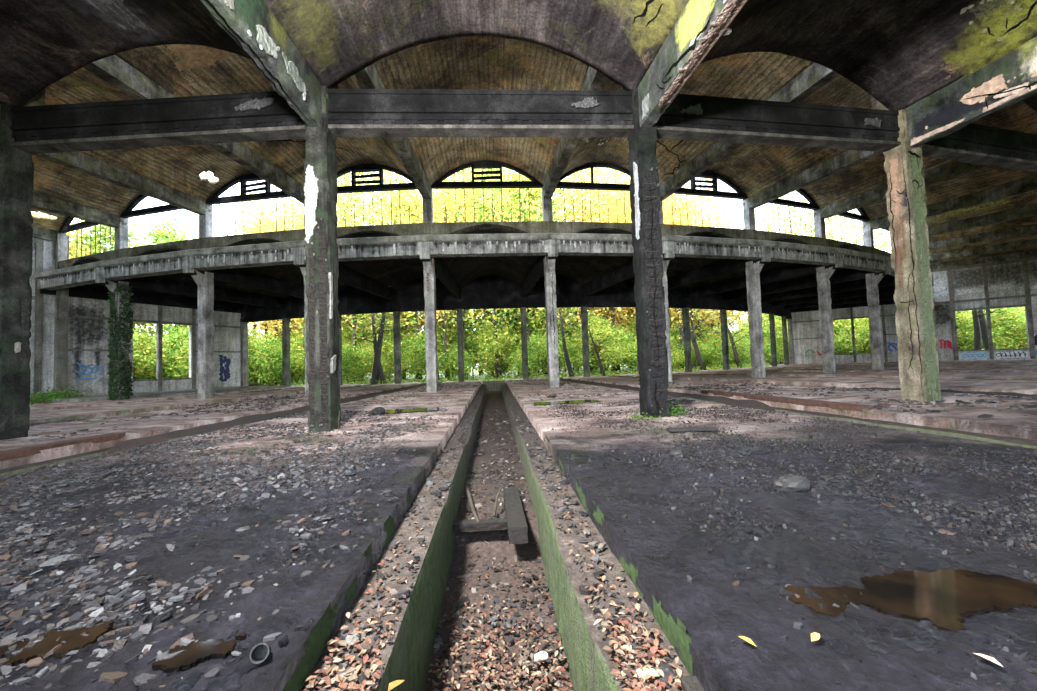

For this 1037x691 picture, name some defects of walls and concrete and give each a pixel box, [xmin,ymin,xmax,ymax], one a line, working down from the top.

peeling [247,25,308,101]
crack [631,0,664,26]
damp [600,0,712,48]
damp [945,0,1037,74]
flaking render [960,70,1037,113]
flaking render [910,118,966,146]
crack [889,151,924,396]
spalling [0,165,440,477]